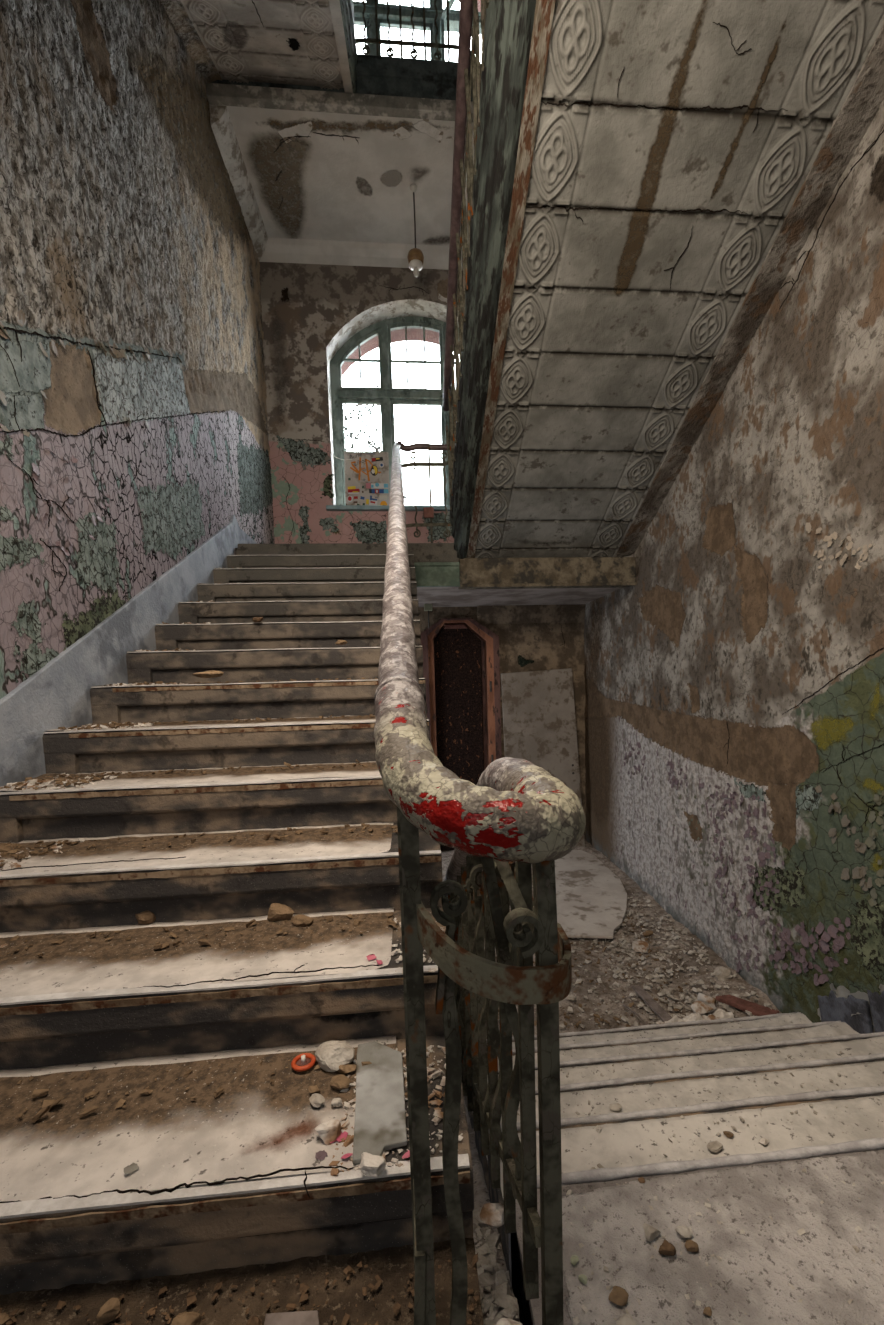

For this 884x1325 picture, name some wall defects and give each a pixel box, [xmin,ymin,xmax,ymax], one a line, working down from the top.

peeling [278,121,313,144]
leakage [249,119,413,238]
leakage [614,0,706,296]
leakage [711,21,786,199]
spalling [638,584,686,648]
spalling [702,502,768,644]
peeling [805,523,872,570]
spalling [584,675,884,1033]
crack [0,1166,358,1203]